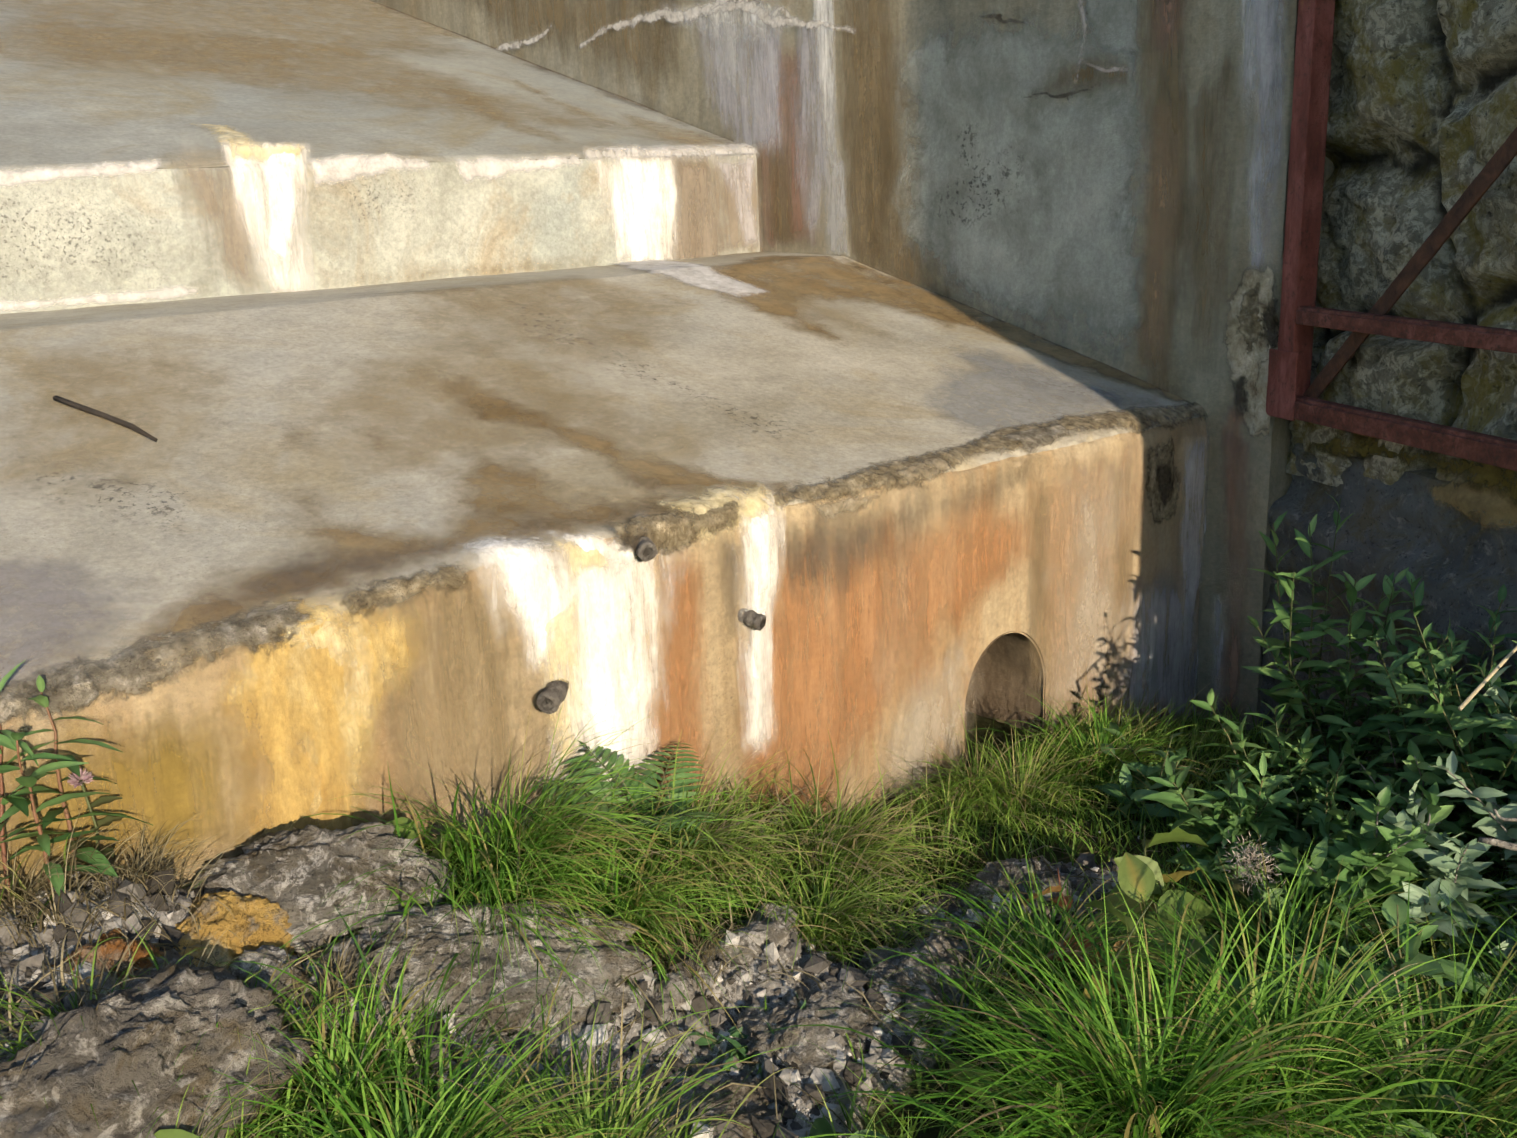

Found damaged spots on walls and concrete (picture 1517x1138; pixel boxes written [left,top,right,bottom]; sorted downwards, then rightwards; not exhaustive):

damp [189,124,307,292]
crack [495,0,853,51]
damp [487,0,1228,429]
crack [1034,0,1128,99]
damp [1243,0,1282,265]
spalling [1224,266,1279,436]
spalling [0,599,310,731]
damp [148,363,871,837]
spalling [610,501,738,555]
rust [645,566,703,797]
rust [749,526,917,822]
spalling [768,402,1208,522]